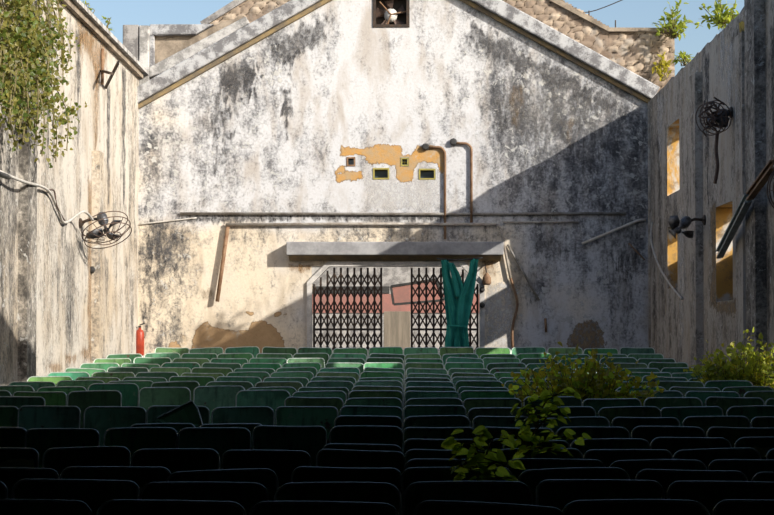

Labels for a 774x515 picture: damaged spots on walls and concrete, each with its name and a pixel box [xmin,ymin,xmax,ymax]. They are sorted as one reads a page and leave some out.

damp [271,16,335,77]
damp [281,89,293,140]
damp [466,21,632,169]
peeling [335,144,444,211]
damp [181,215,448,234]
damp [139,219,184,344]
peeling [192,311,287,353]
peeling [567,319,607,351]